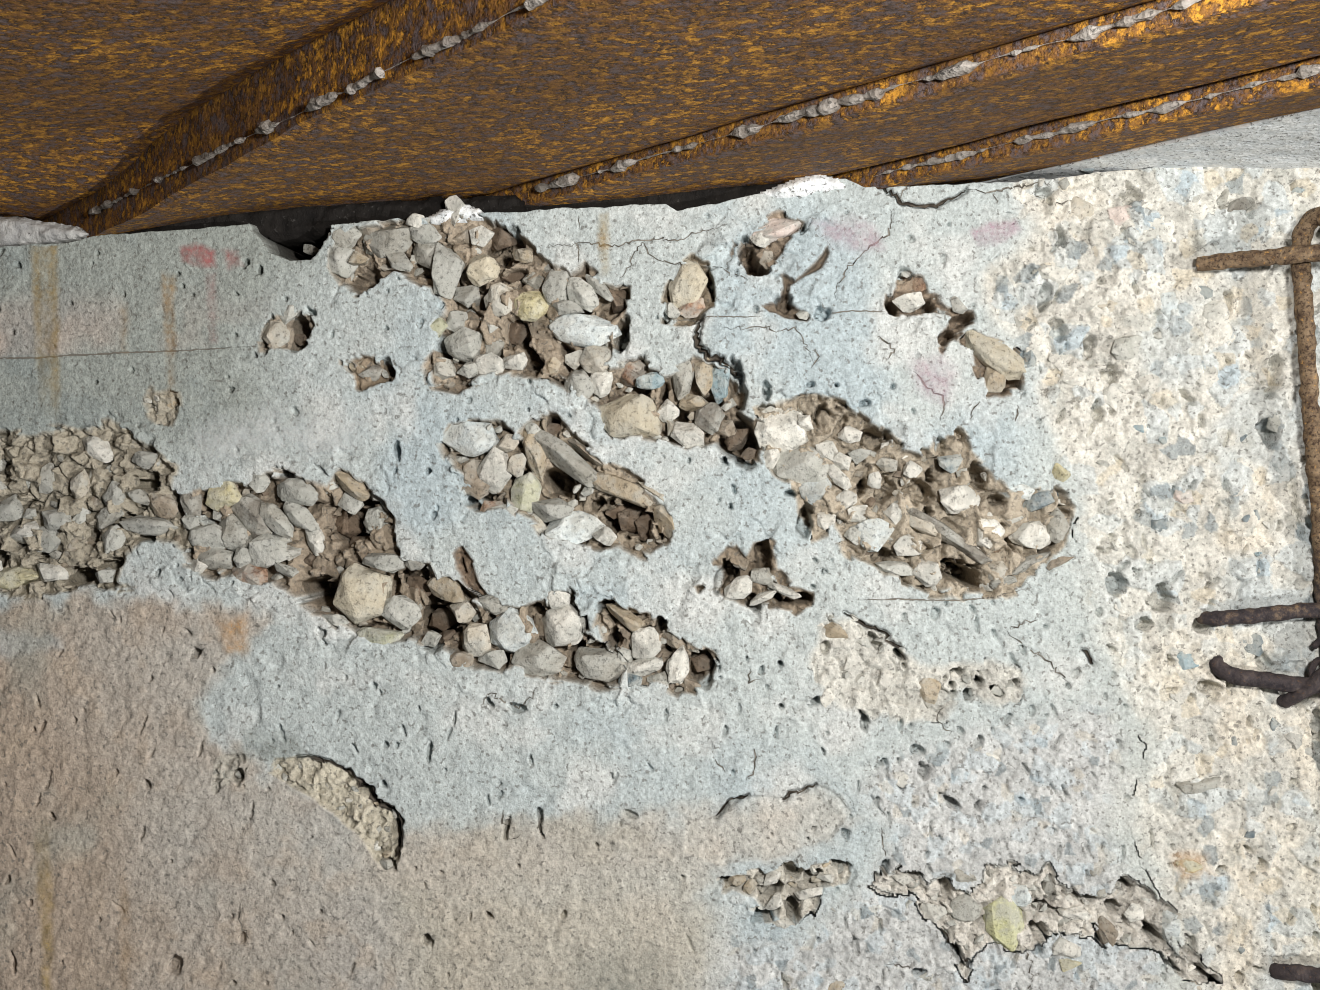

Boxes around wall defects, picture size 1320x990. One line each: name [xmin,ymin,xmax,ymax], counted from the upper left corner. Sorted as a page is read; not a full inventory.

spalling [0,436,713,693]
spalling [326,167,1320,990]
peeling [268,755,404,870]